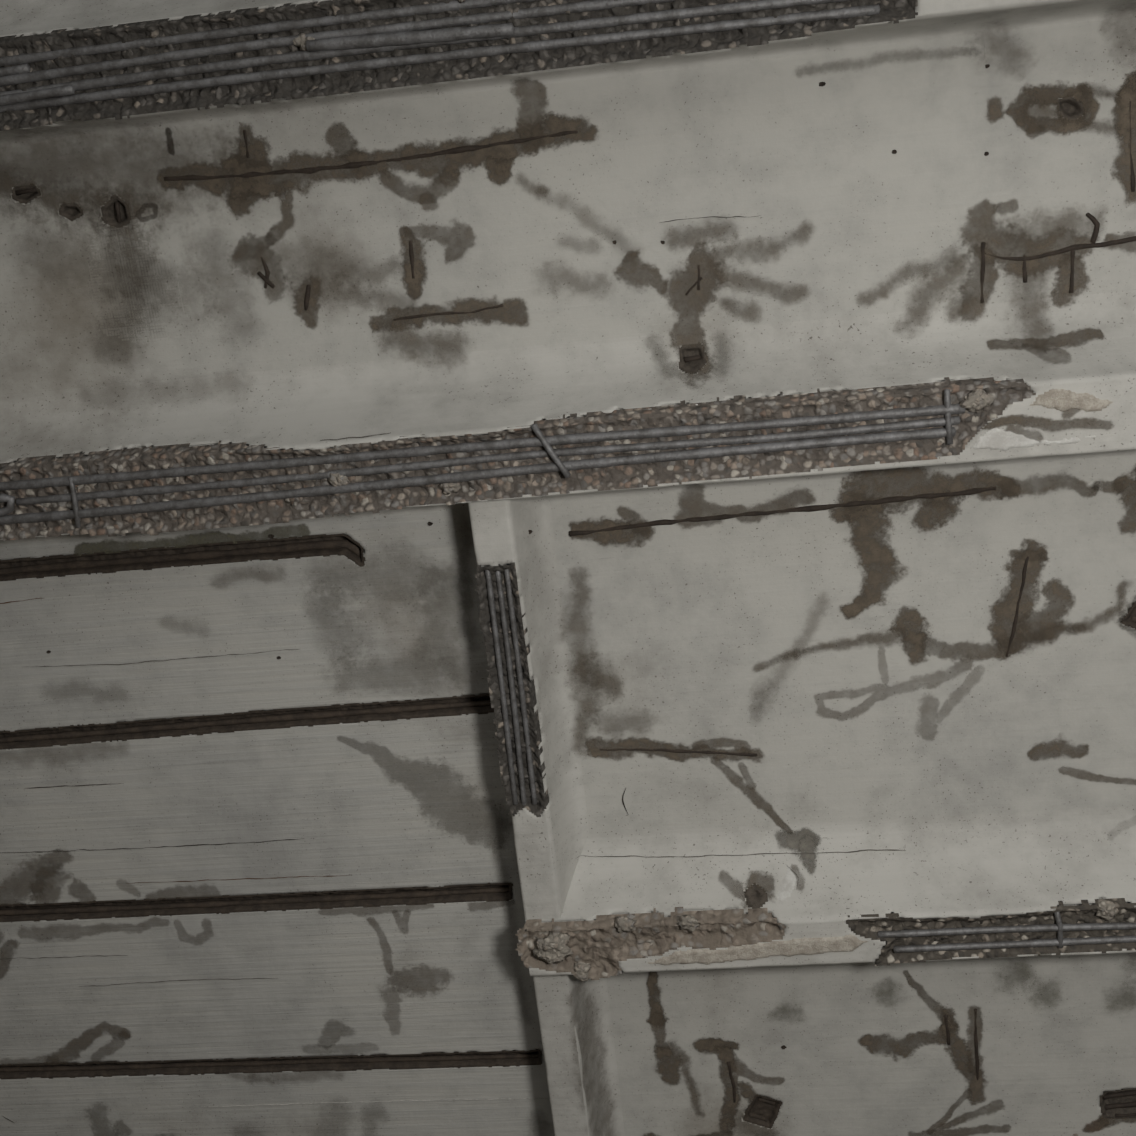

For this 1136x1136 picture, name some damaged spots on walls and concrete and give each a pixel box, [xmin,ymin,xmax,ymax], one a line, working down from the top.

spalling [0,0,918,131]
damp [267,190,294,244]
crack [660,215,756,223]
spalling [0,377,1113,541]
spalling [475,562,549,817]
crack [2,839,297,853]
crack [126,875,346,884]
crack [577,849,906,886]
spalling [515,867,1136,981]
crack [0,953,127,961]
crack [79,978,273,987]